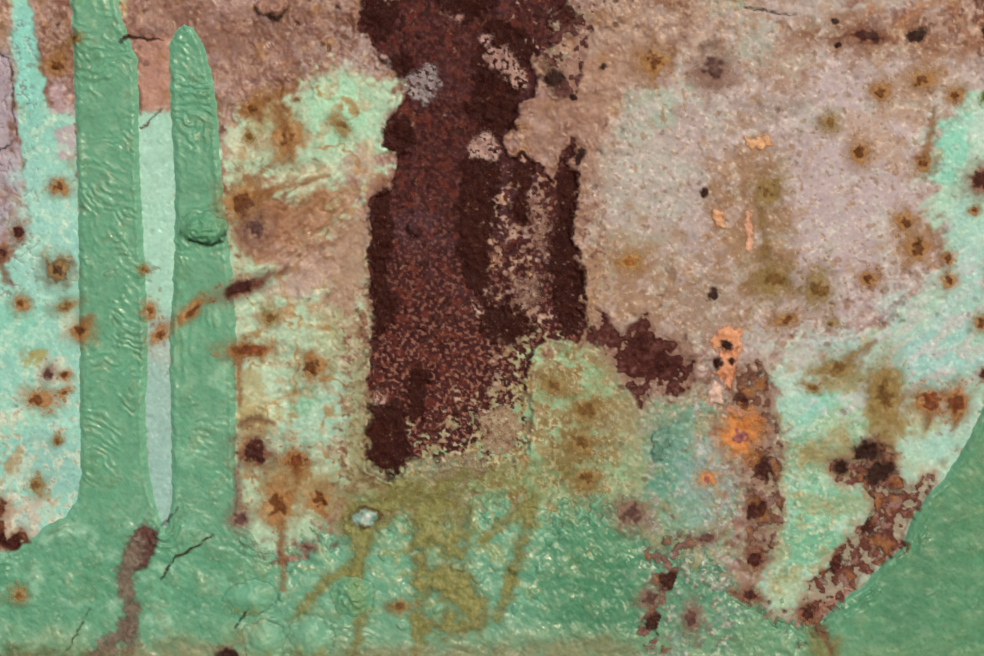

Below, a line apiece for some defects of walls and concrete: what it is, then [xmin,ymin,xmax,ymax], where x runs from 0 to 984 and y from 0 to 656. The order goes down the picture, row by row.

corrosion [835,23,890,48]
corrosion [906,28,926,42]
crack [0,54,17,150]
peeling [744,135,774,150]
corrosion [964,164,984,216]
corrosion [0,221,31,312]
corrosion [42,254,76,284]
peeling [357,0,695,491]
peeling [744,211,754,252]
corrosion [892,211,957,289]
corrosion [27,364,72,413]
peeling [707,325,785,556]